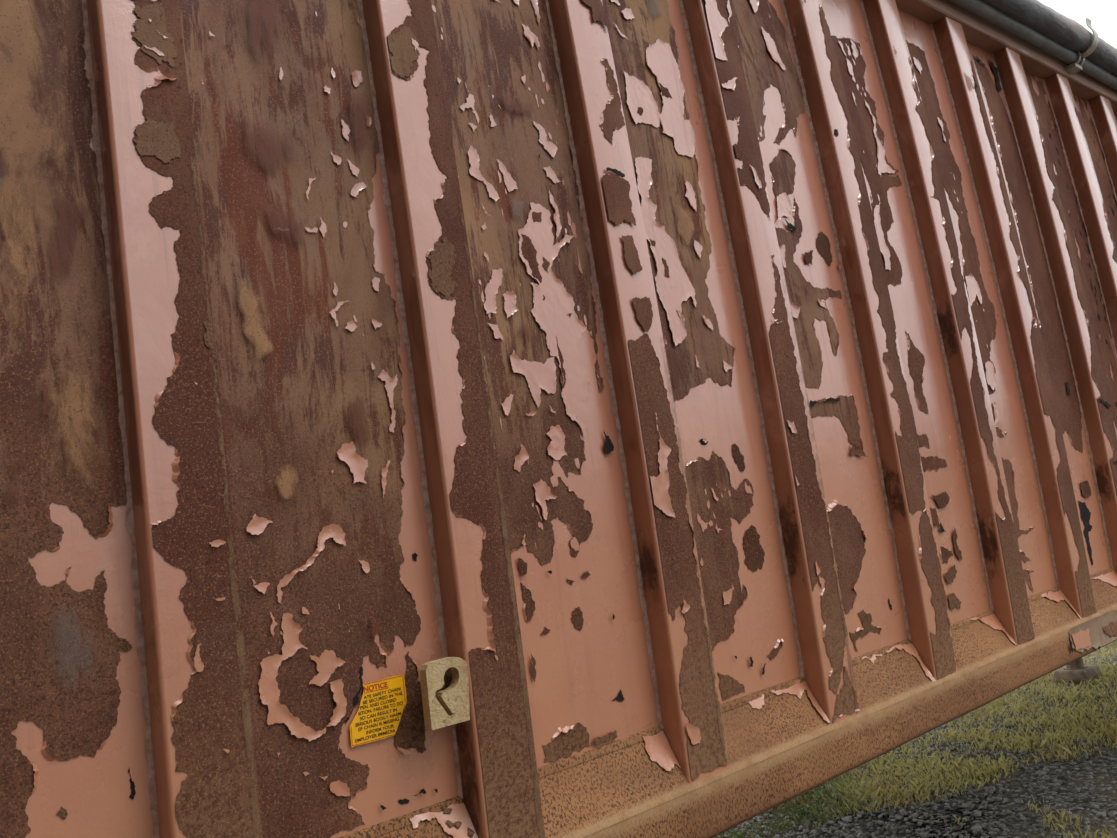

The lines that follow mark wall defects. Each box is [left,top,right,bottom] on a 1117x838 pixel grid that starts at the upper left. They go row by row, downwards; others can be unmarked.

peeling [0,0,132,838]
peeling [131,0,427,838]
corrosion [455,724,479,830]
peeling [380,0,618,838]
peeling [582,0,1117,782]